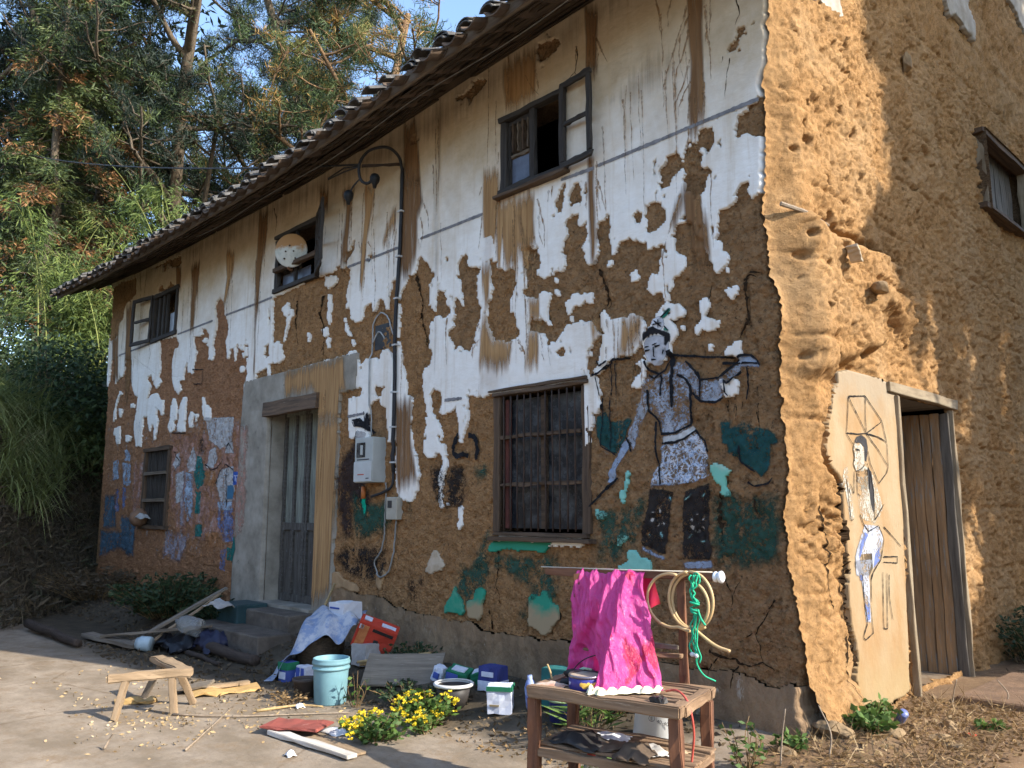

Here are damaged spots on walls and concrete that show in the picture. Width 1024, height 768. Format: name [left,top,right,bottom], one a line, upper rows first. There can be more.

flaking render [942,0,976,43]
flaking render [1006,0,1024,35]
spalling [654,128,721,194]
crack [415,275,429,346]
spalling [97,182,809,688]
crack [688,600,776,688]